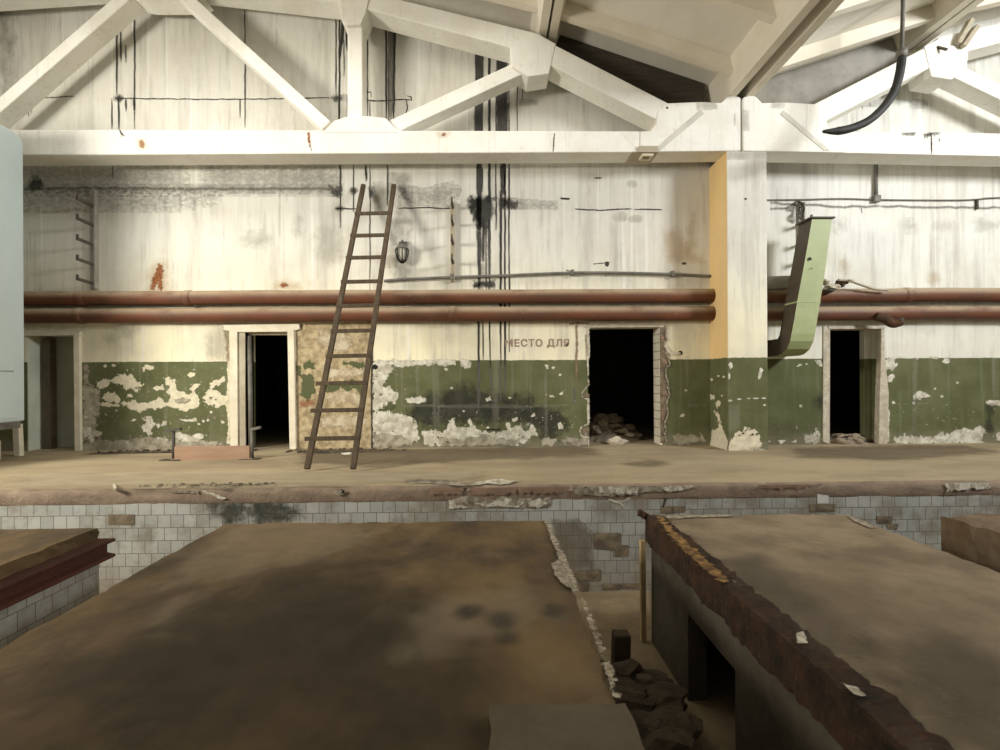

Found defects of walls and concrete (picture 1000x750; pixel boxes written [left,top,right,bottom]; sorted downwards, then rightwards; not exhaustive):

water stain [475,54,509,81]
water stain [474,86,523,131]
corrosion [151,263,164,291]
water stain [467,163,518,290]
flaking render [82,327,230,451]
flaking render [296,322,590,449]
spalling [660,325,822,451]
peeling [887,401,1000,444]
water stain [208,503,297,524]
peeling [406,478,693,510]
spalling [545,521,640,698]
corrosion [645,515,954,750]